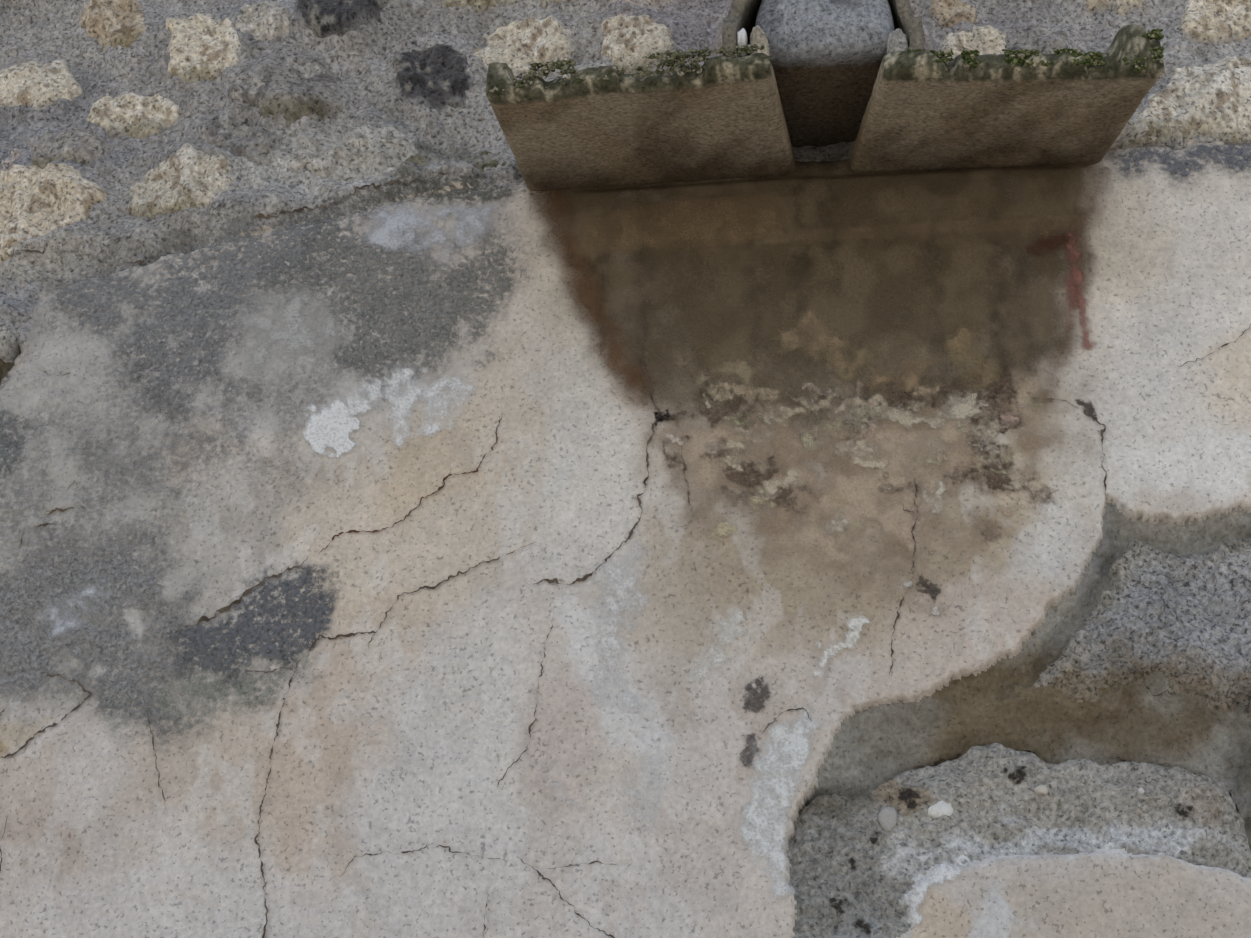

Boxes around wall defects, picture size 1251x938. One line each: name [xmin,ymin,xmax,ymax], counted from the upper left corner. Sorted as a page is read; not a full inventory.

corrosion [1032,233,1093,349]
crack [19,481,84,547]
crack [175,406,503,632]
leakage [0,161,1091,735]
crack [534,303,693,585]
crack [889,477,918,676]
crack [2,674,92,758]
crack [147,710,169,813]
crack [245,542,534,938]
crack [497,618,553,786]
spalling [787,503,1251,938]
crack [339,845,622,938]